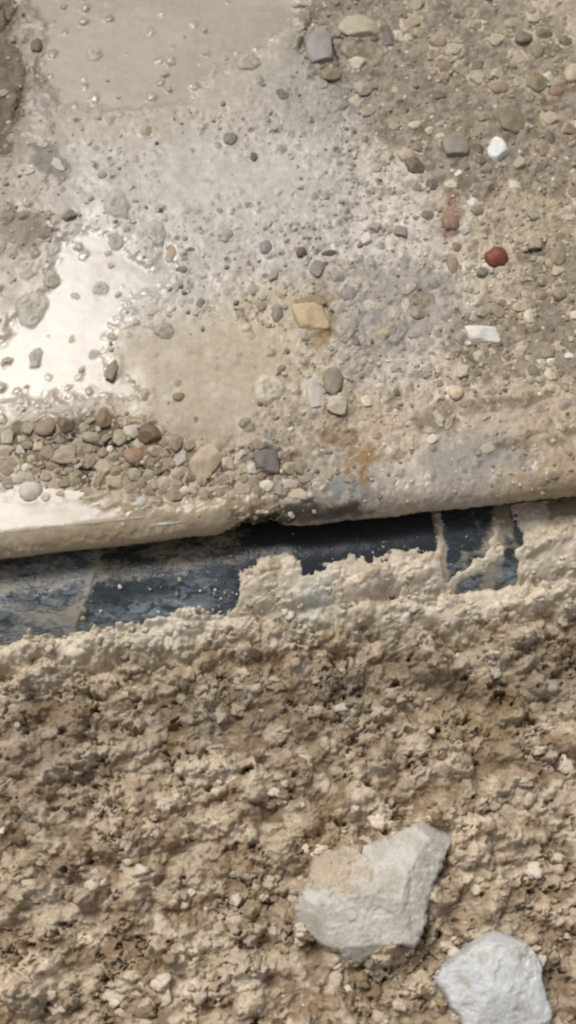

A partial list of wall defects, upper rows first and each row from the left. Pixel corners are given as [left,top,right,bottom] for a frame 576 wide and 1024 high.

rust [318,428,375,487]
spalling [225,513,295,532]